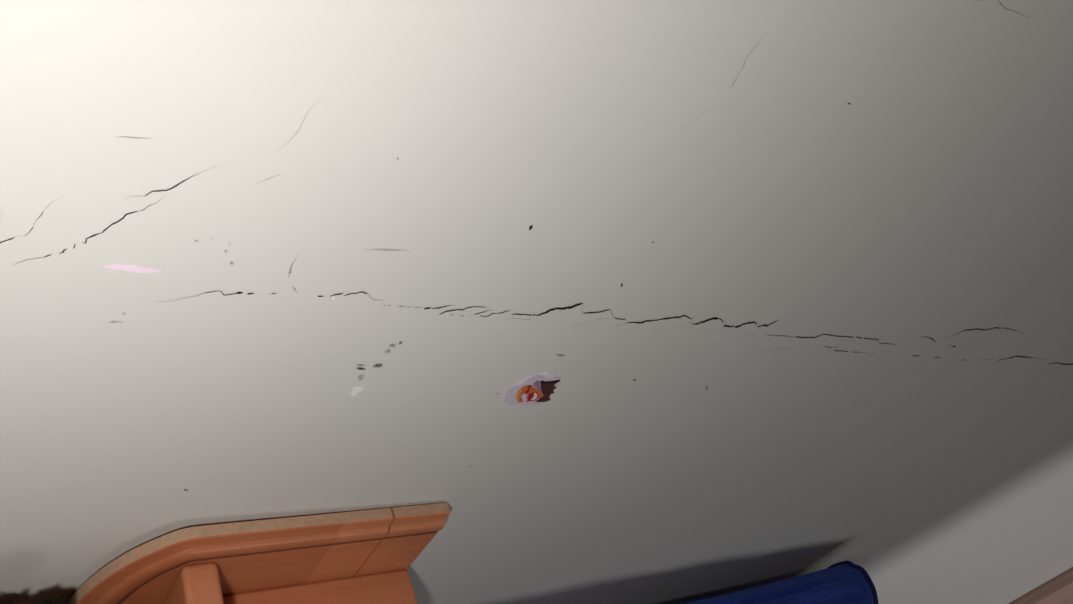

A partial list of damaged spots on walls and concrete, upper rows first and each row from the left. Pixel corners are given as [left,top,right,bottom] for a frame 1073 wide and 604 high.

crack [0,177,191,260]
crack [206,268,941,358]
crack [962,327,1073,365]